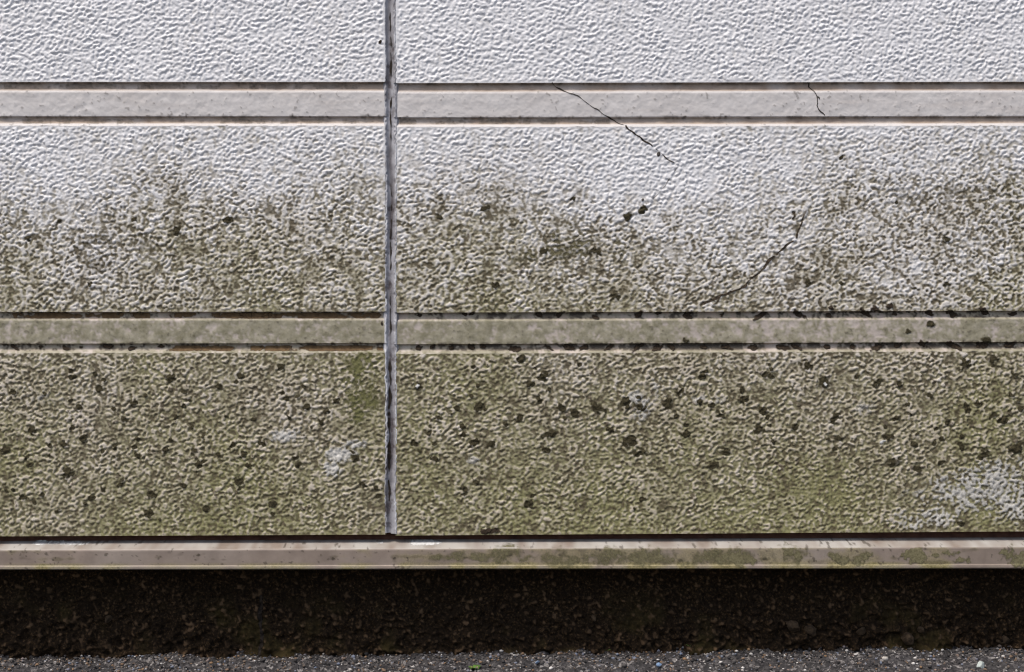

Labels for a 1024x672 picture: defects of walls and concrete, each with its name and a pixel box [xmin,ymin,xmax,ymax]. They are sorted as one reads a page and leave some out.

crack [552,82,674,201]
damp [546,224,590,260]
crack [701,211,806,305]
efflorescence [273,429,300,442]
efflorescence [324,440,366,477]
damp [342,352,379,424]
damp [628,390,648,420]
efflorescence [890,459,1024,530]